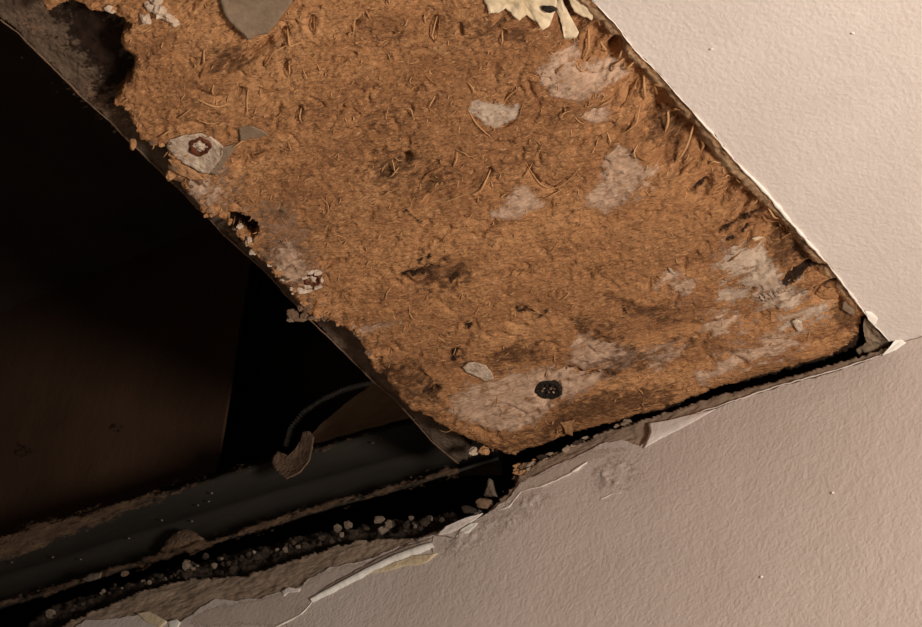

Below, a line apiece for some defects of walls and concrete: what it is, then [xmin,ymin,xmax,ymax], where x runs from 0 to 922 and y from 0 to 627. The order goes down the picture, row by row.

peeling [220,0,293,40]
water stain [26,3,134,123]
peeling [537,41,630,100]
peeling [469,99,519,127]
water stain [646,104,681,147]
peeling [490,185,545,220]
peeling [582,145,659,214]
water stain [773,224,808,266]
water stain [493,340,545,370]
water stain [739,309,859,383]
spalling [0,239,906,627]
water stain [531,383,682,442]